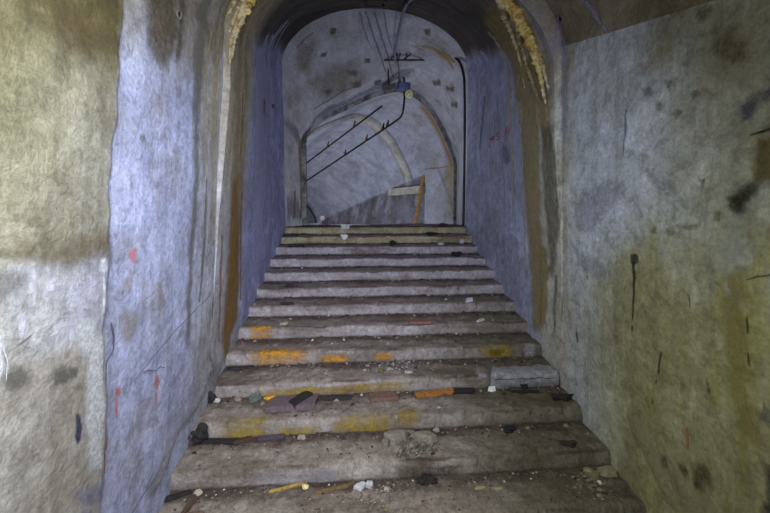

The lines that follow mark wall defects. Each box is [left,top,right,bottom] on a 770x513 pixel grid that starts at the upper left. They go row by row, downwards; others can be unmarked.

water stain [187,0,259,309]
rust [218,34,246,354]
water stain [313,11,394,122]
water stain [475,0,560,325]